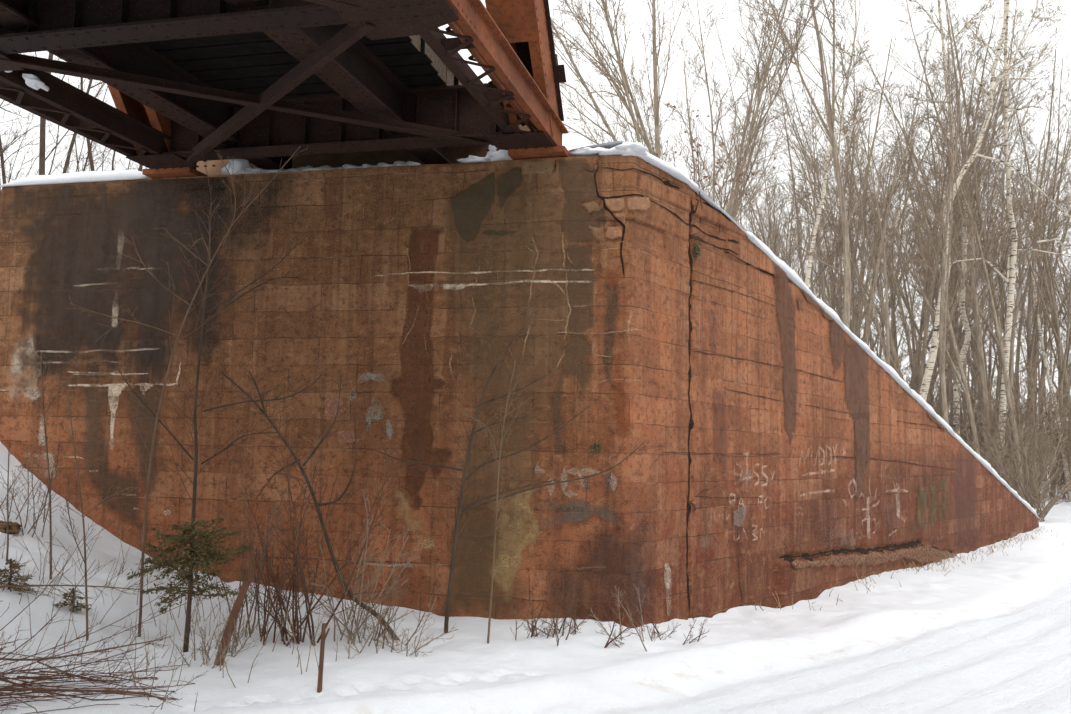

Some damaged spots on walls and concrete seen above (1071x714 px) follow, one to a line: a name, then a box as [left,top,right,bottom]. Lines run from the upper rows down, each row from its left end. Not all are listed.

water stain [451,168,522,241]
spalling [583,197,650,240]
water stain [402,271,490,289]
water stain [522,158,605,386]
water stain [605,291,616,379]
crack [585,160,851,610]
crack [830,456,962,471]
spalling [792,545,957,569]